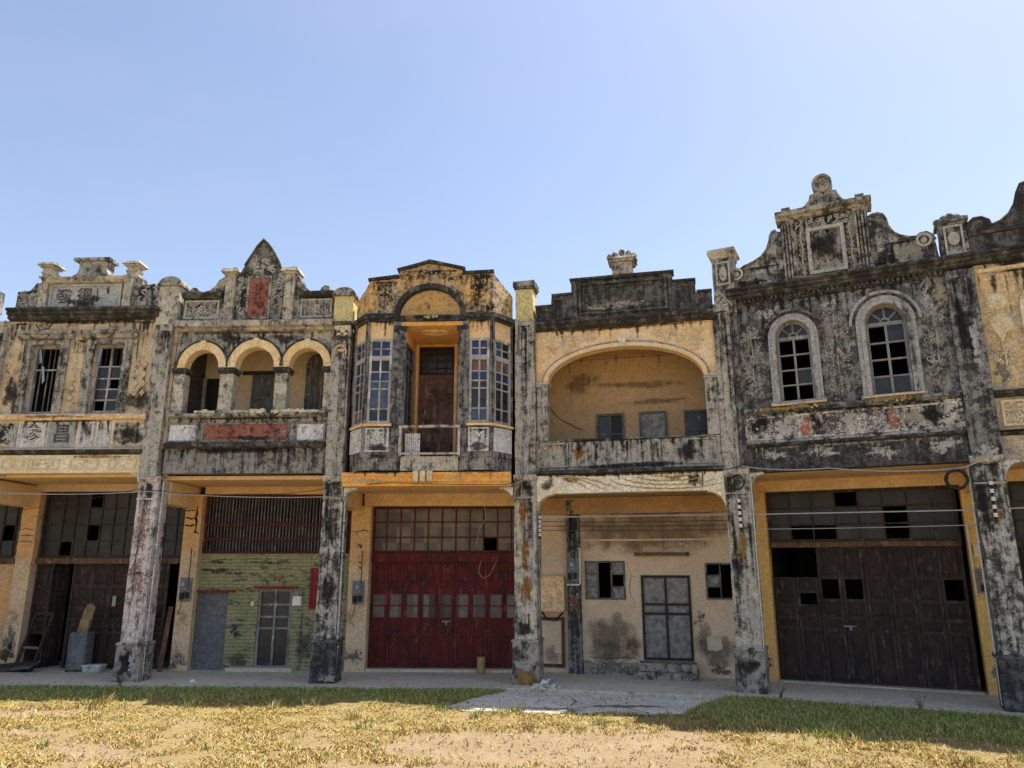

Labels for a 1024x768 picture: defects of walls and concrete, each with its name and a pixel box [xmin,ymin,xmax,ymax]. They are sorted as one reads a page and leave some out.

leakage [739,264,779,286]
leakage [547,279,933,412]
flaking render [756,403,823,437]
flaking render [839,394,930,436]
leakage [748,400,1011,535]
leakage [139,483,153,513]
leakage [322,483,340,545]
leakage [518,436,754,605]
rust [519,501,532,601]
leakage [319,578,335,603]
leakage [594,617,634,660]
leakage [117,652,133,677]